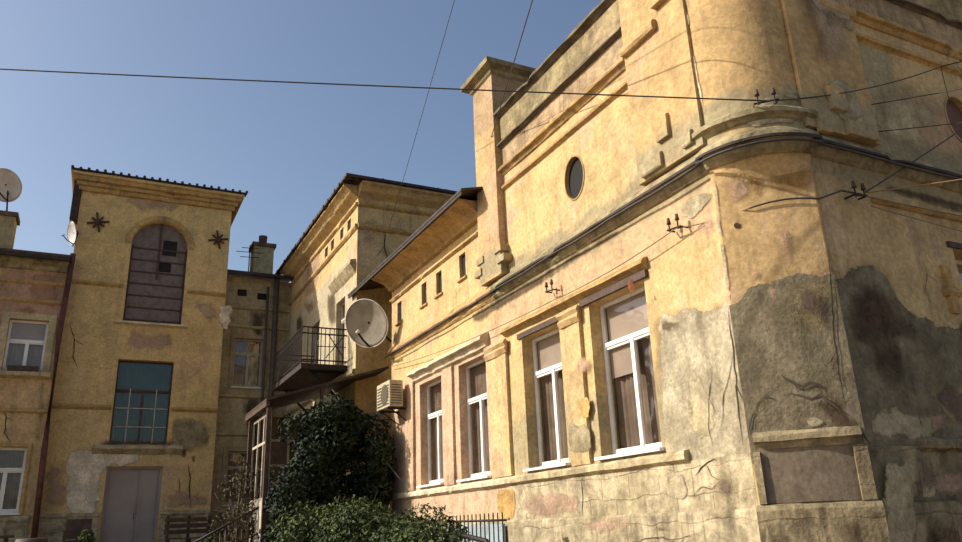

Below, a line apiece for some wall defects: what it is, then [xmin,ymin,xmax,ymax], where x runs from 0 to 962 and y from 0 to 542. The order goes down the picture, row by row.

flaking render [198,304,233,329]
flaking render [657,183,962,477]
flaking render [172,419,209,457]
flaking render [568,397,591,453]
crack [693,311,755,496]
flaking render [883,463,962,542]